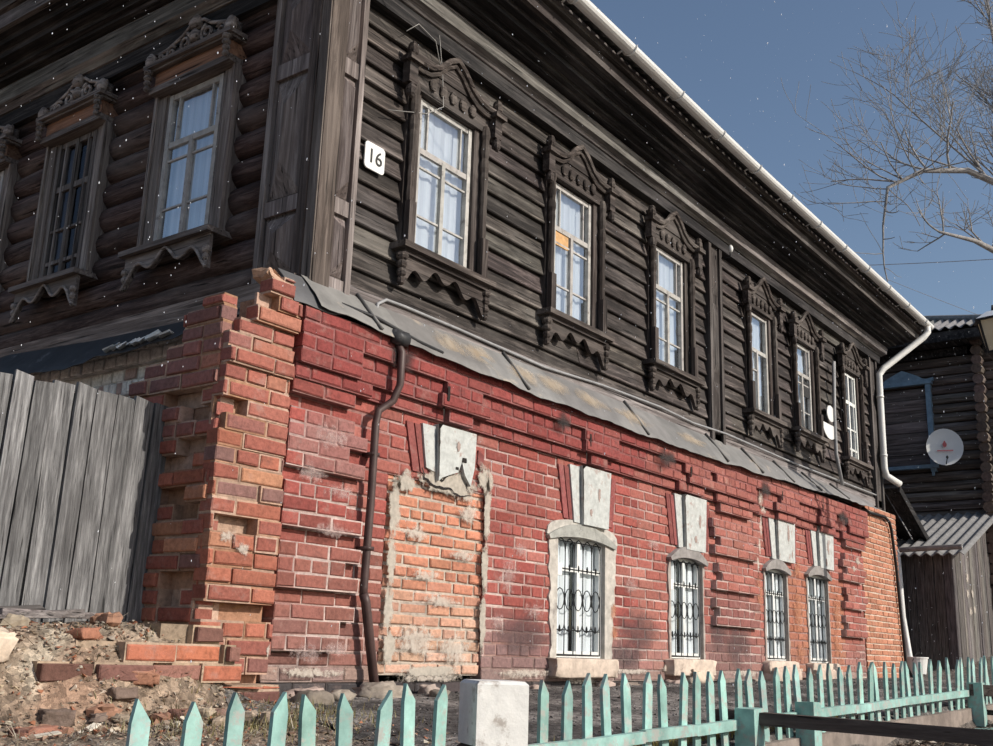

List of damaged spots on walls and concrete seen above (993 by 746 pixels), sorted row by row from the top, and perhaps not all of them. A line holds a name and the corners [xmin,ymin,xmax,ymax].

flaking render [383,441,494,682]
spalling [283,668,343,677]
spalling [500,669,550,677]